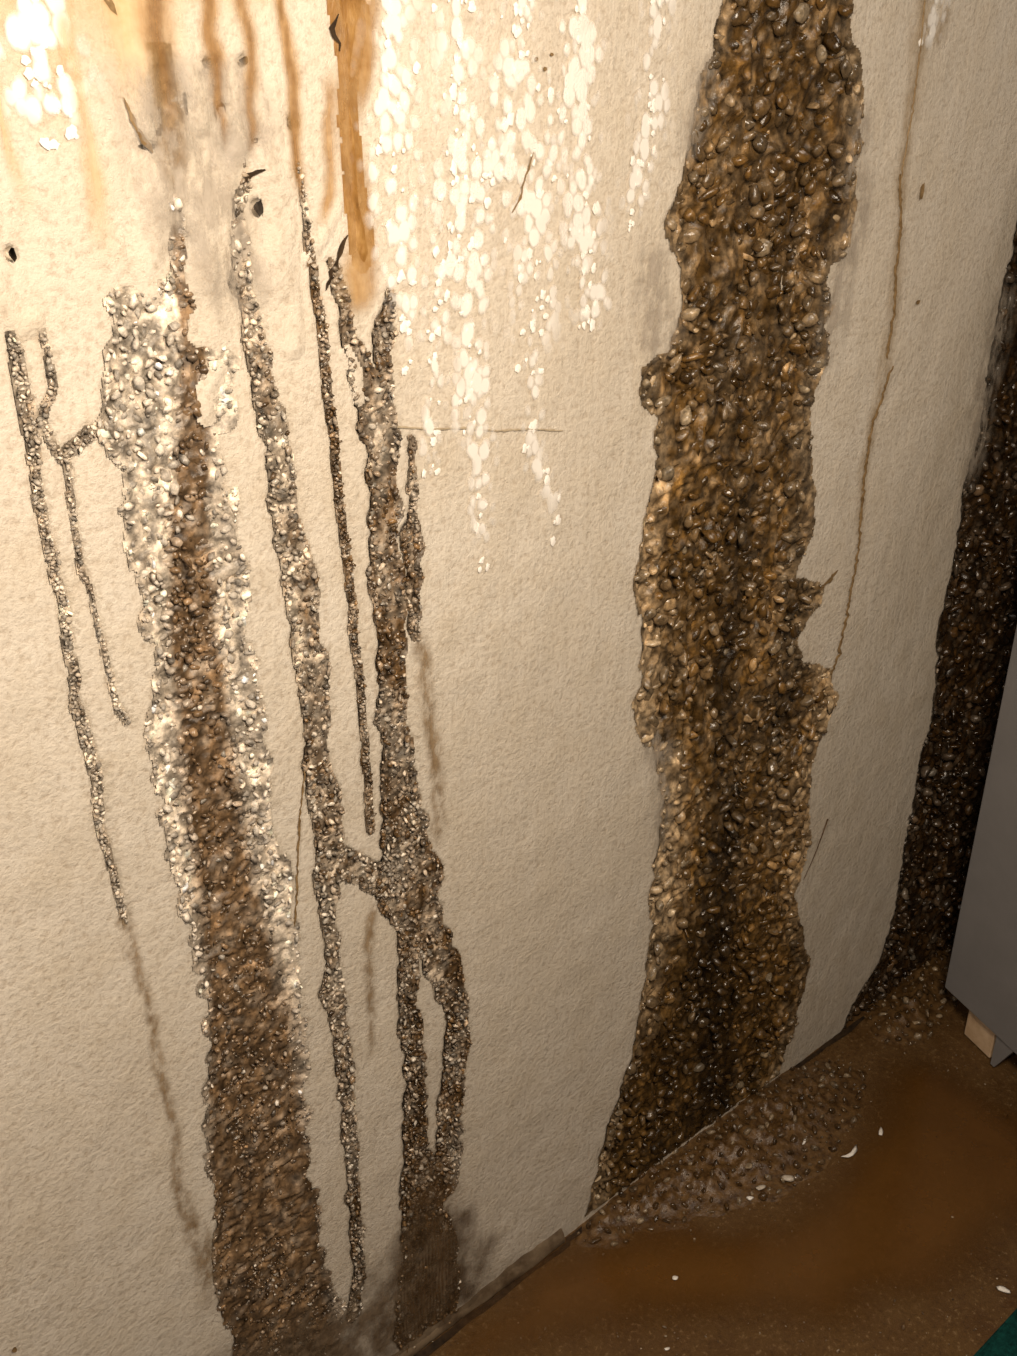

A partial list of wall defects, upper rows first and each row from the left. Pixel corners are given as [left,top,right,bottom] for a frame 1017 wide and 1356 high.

efflorescence [0,0,87,151]
rust [104,0,182,164]
leakage [141,74,259,292]
efflorescence [369,0,610,546]
efflorescence [627,0,675,232]
crack [813,0,926,675]
rust [161,0,473,1356]
leakage [417,643,442,798]
leakage [365,912,375,1034]
leakage [133,945,198,1231]
leakage [249,1186,482,1356]